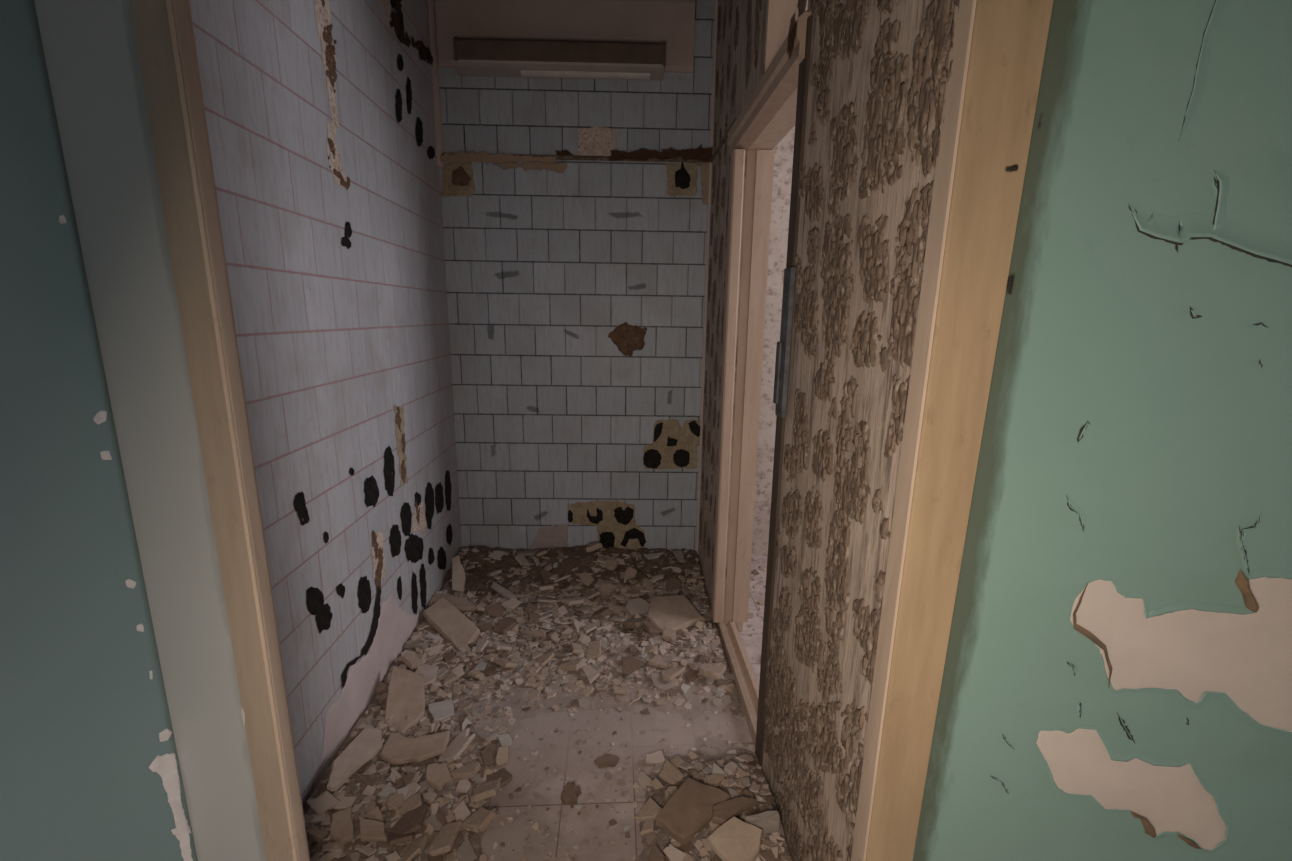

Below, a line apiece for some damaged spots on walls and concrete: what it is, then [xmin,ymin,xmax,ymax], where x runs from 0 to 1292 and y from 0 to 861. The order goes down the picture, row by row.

spalling [378,0,433,67]
peeling [441,162,475,197]
peeling [666,162,698,196]
spalling [608,322,647,357]
spalling [394,405,408,487]
peeling [643,419,700,470]
spalling [413,501,426,534]
peeling [528,500,646,550]
spalling [322,529,424,760]
peeling [1068,569,1292,745]
peeling [149,729,193,861]
peeling [1035,725,1235,855]